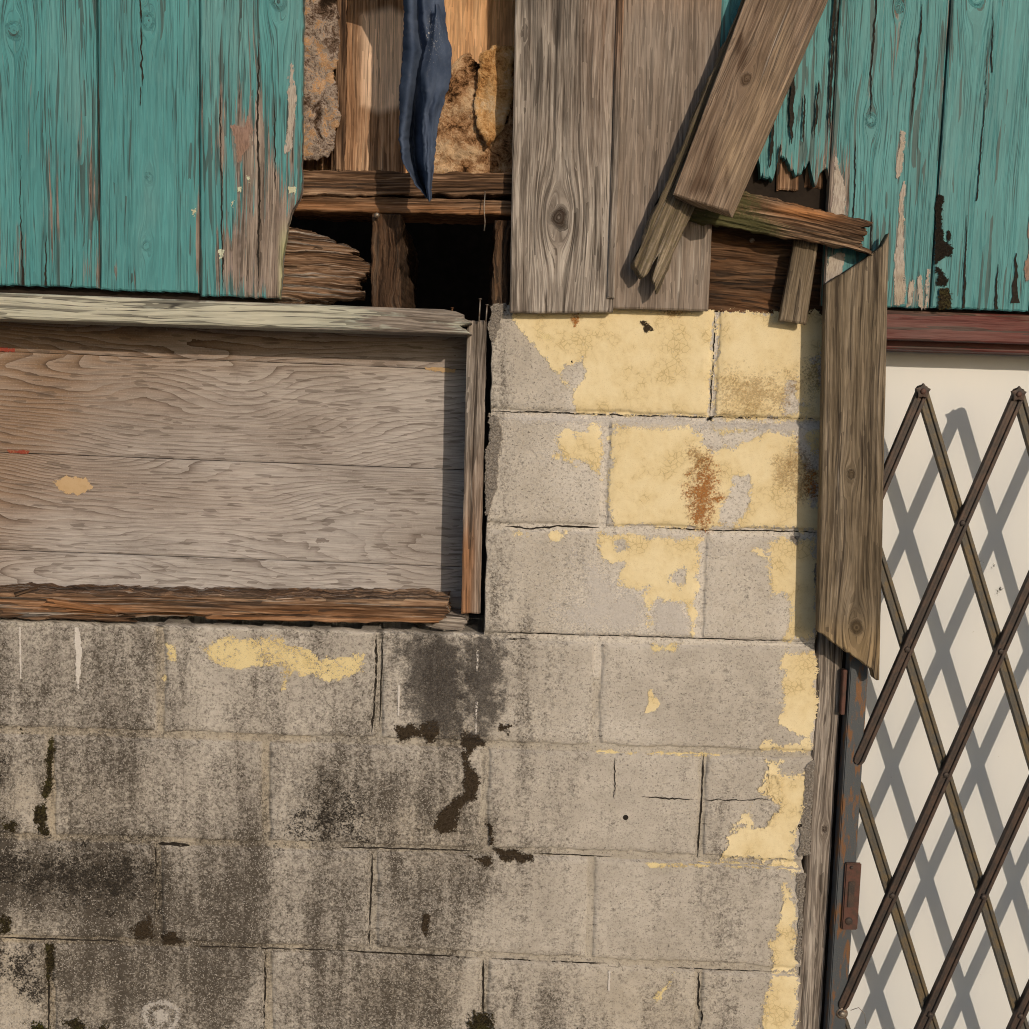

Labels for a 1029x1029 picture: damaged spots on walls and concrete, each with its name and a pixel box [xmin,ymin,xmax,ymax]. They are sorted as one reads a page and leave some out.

peeling [230,115,253,163]
peeling [284,63,297,154]
peeling [893,129,931,310]
spalling [484,413,502,516]
rust [681,450,724,532]
peeling [165,643,177,661]
peeling [199,635,366,691]
peeling [487,302,822,1029]
water stain [393,631,512,834]
water stain [467,823,534,869]